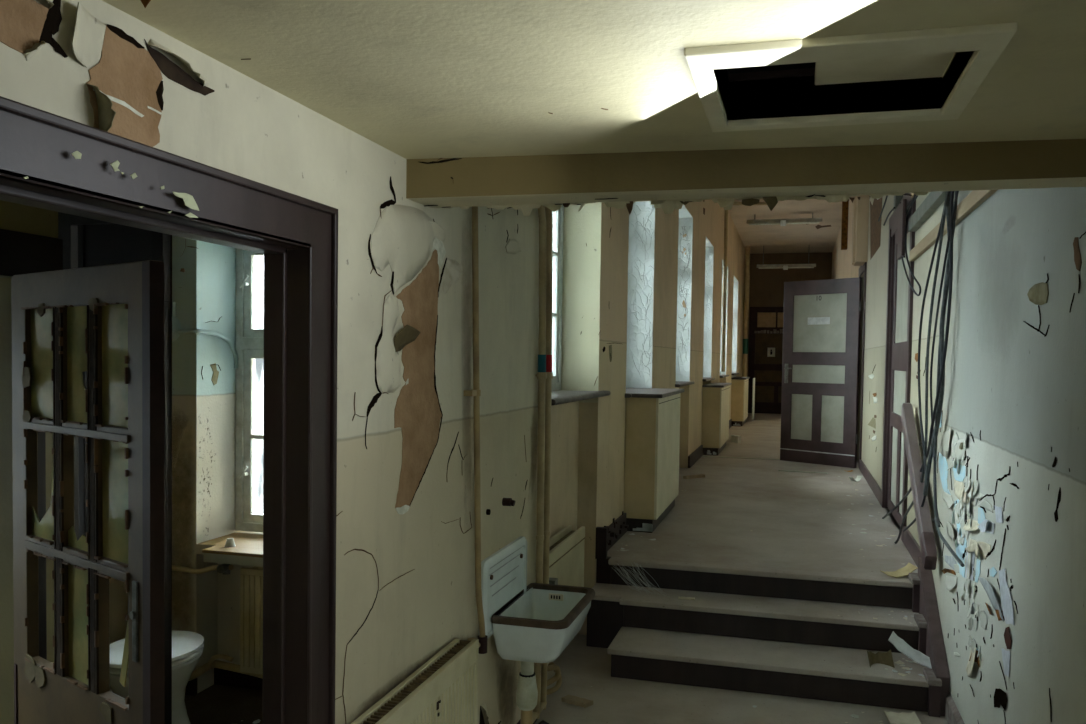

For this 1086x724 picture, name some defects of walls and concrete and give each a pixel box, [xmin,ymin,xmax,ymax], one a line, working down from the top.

peeling [0,0,215,147]
spalling [111,160,138,179]
spalling [160,186,199,218]
crack [352,176,396,449]
peeling [394,220,462,514]
crack [409,258,466,507]
peeling [436,192,928,216]
peeling [868,393,877,448]
peeling [1023,273,1050,336]
peeling [1069,232,1086,313]
crack [335,549,414,724]
peeling [937,410,1019,724]